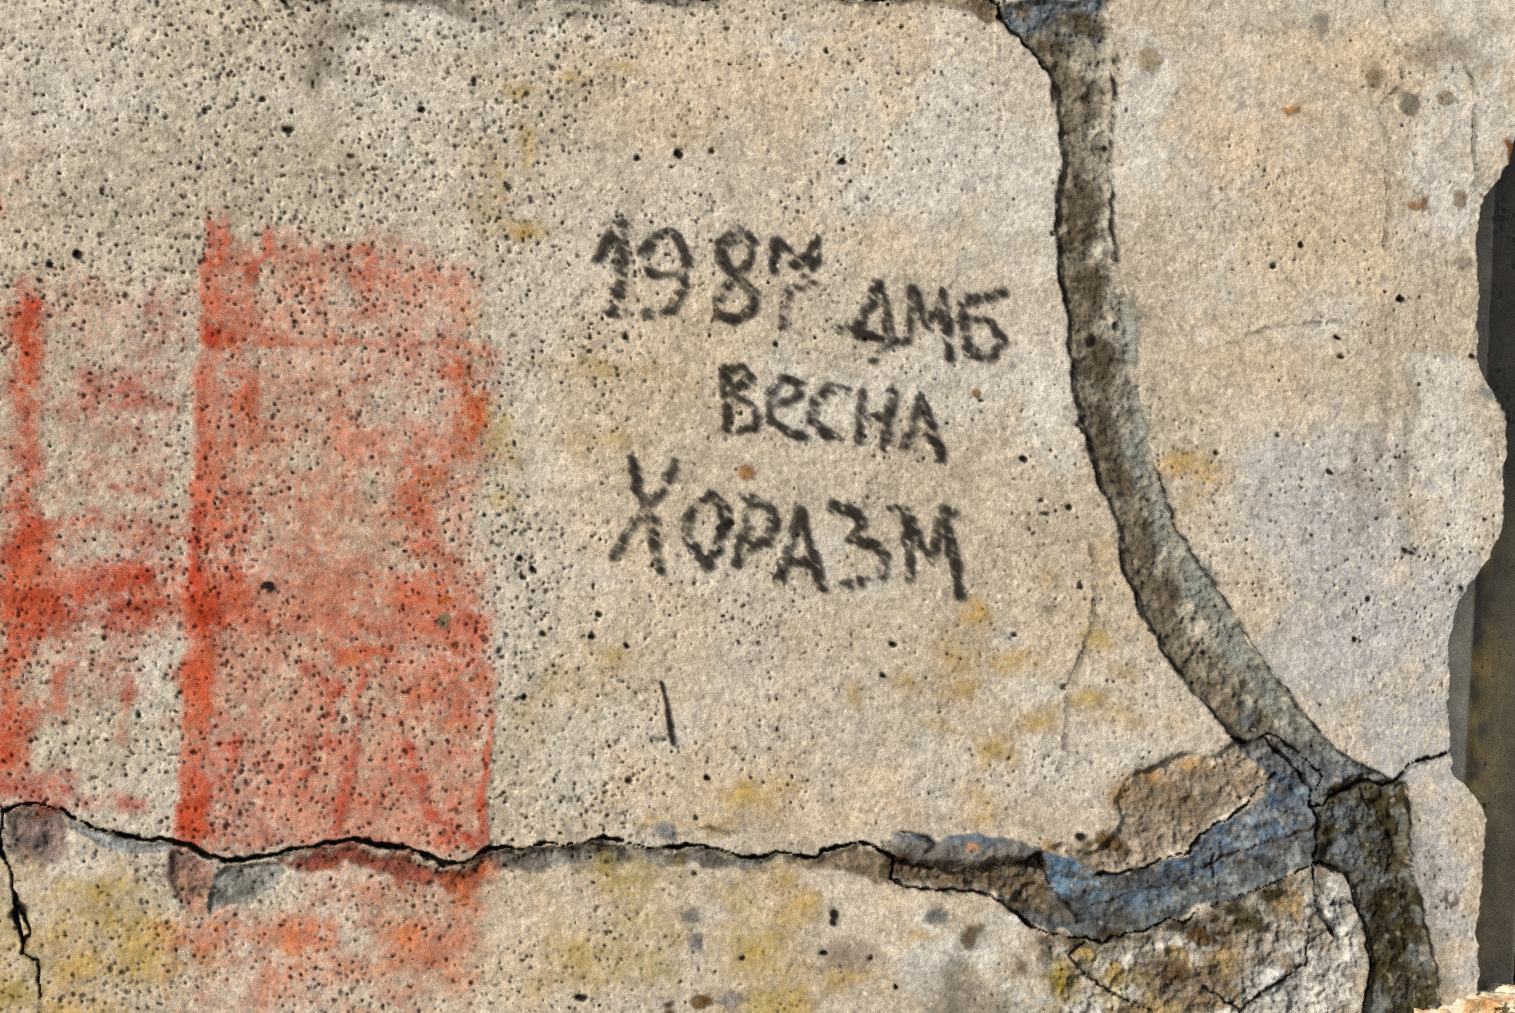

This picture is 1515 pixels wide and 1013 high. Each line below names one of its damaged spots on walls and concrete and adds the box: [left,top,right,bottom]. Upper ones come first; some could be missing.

crack [0,802,1195,1011]
crack [985,0,1449,1013]